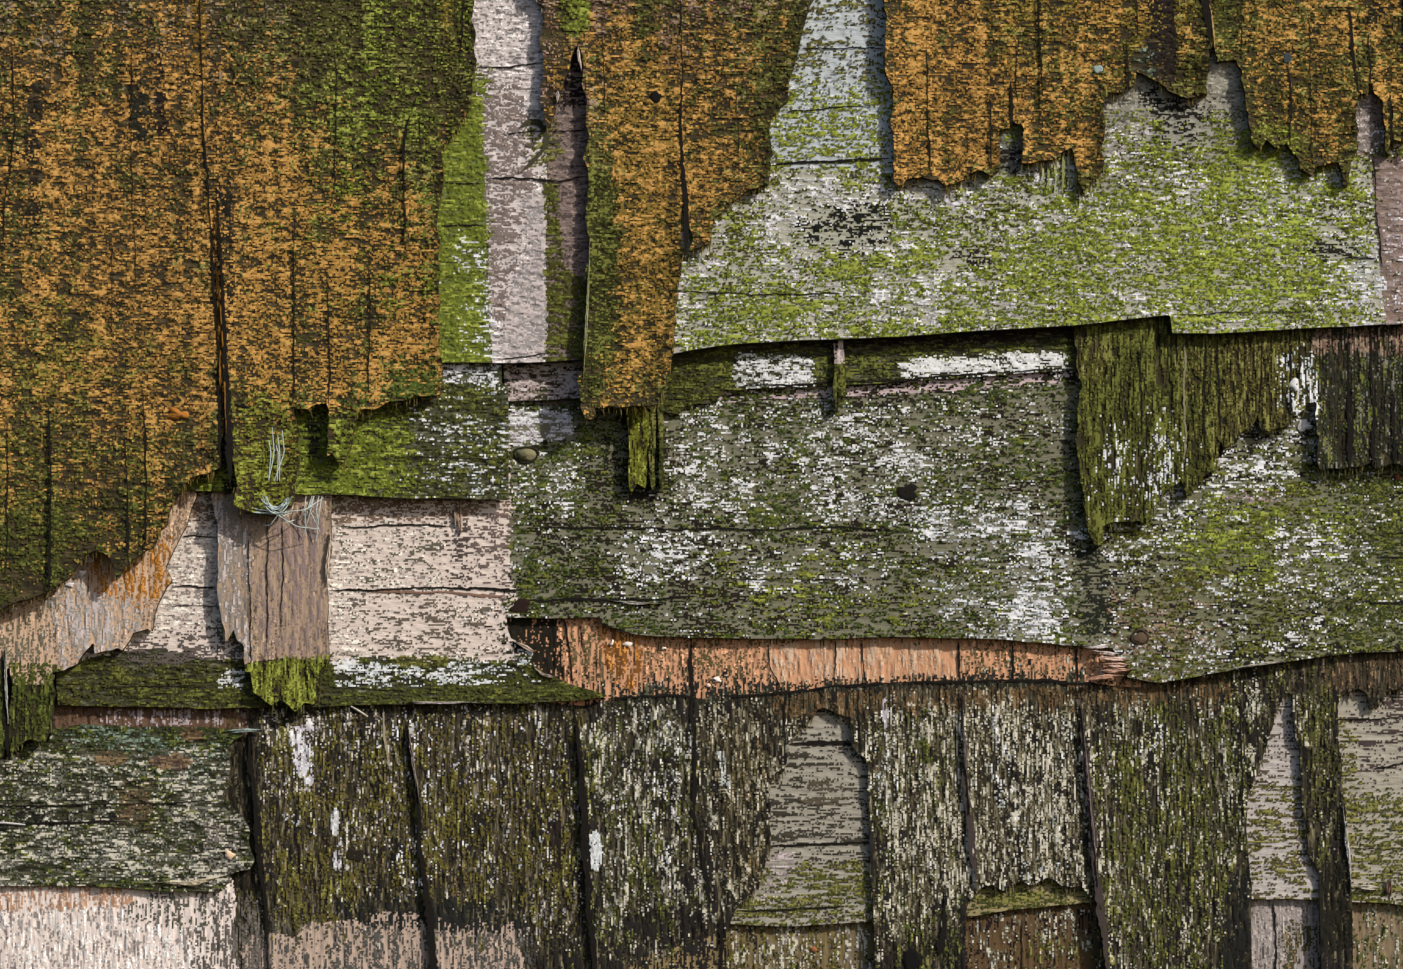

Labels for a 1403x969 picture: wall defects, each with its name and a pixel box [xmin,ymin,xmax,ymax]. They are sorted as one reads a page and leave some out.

damp [0,0,345,578]
crack [199,0,234,489]
peeling [438,0,590,363]
damp [479,0,812,333]
damp [794,201,896,261]
damp [1000,142,1026,174]
peeling [674,0,1403,353]
damp [1370,155,1403,237]
peeling [0,370,1403,706]
peeling [54,703,250,735]
peeling [629,708,875,969]